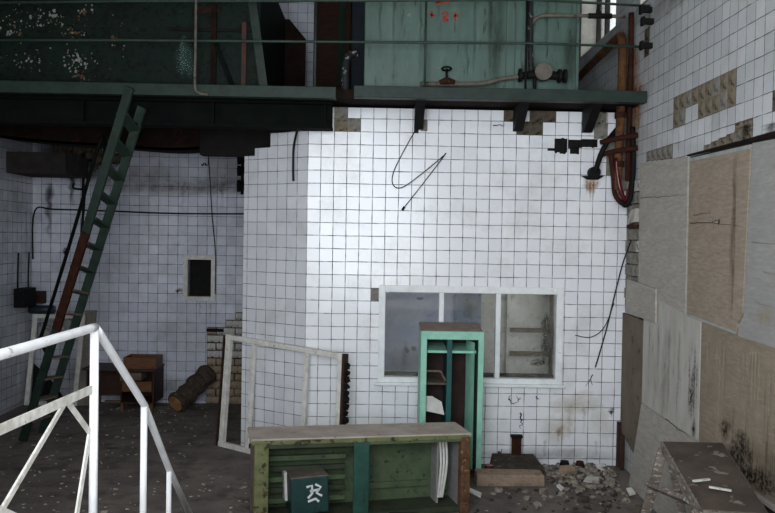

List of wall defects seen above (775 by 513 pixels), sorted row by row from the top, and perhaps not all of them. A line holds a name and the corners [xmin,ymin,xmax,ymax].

peeling [673,68,737,129]
peeling [334,107,361,132]
peeling [504,110,513,122]
peeling [516,111,556,135]
peeling [704,118,753,150]
peeling [646,144,673,162]
flaking render [547,112,640,311]
flaking render [206,312,243,404]
leakage [730,436,775,492]